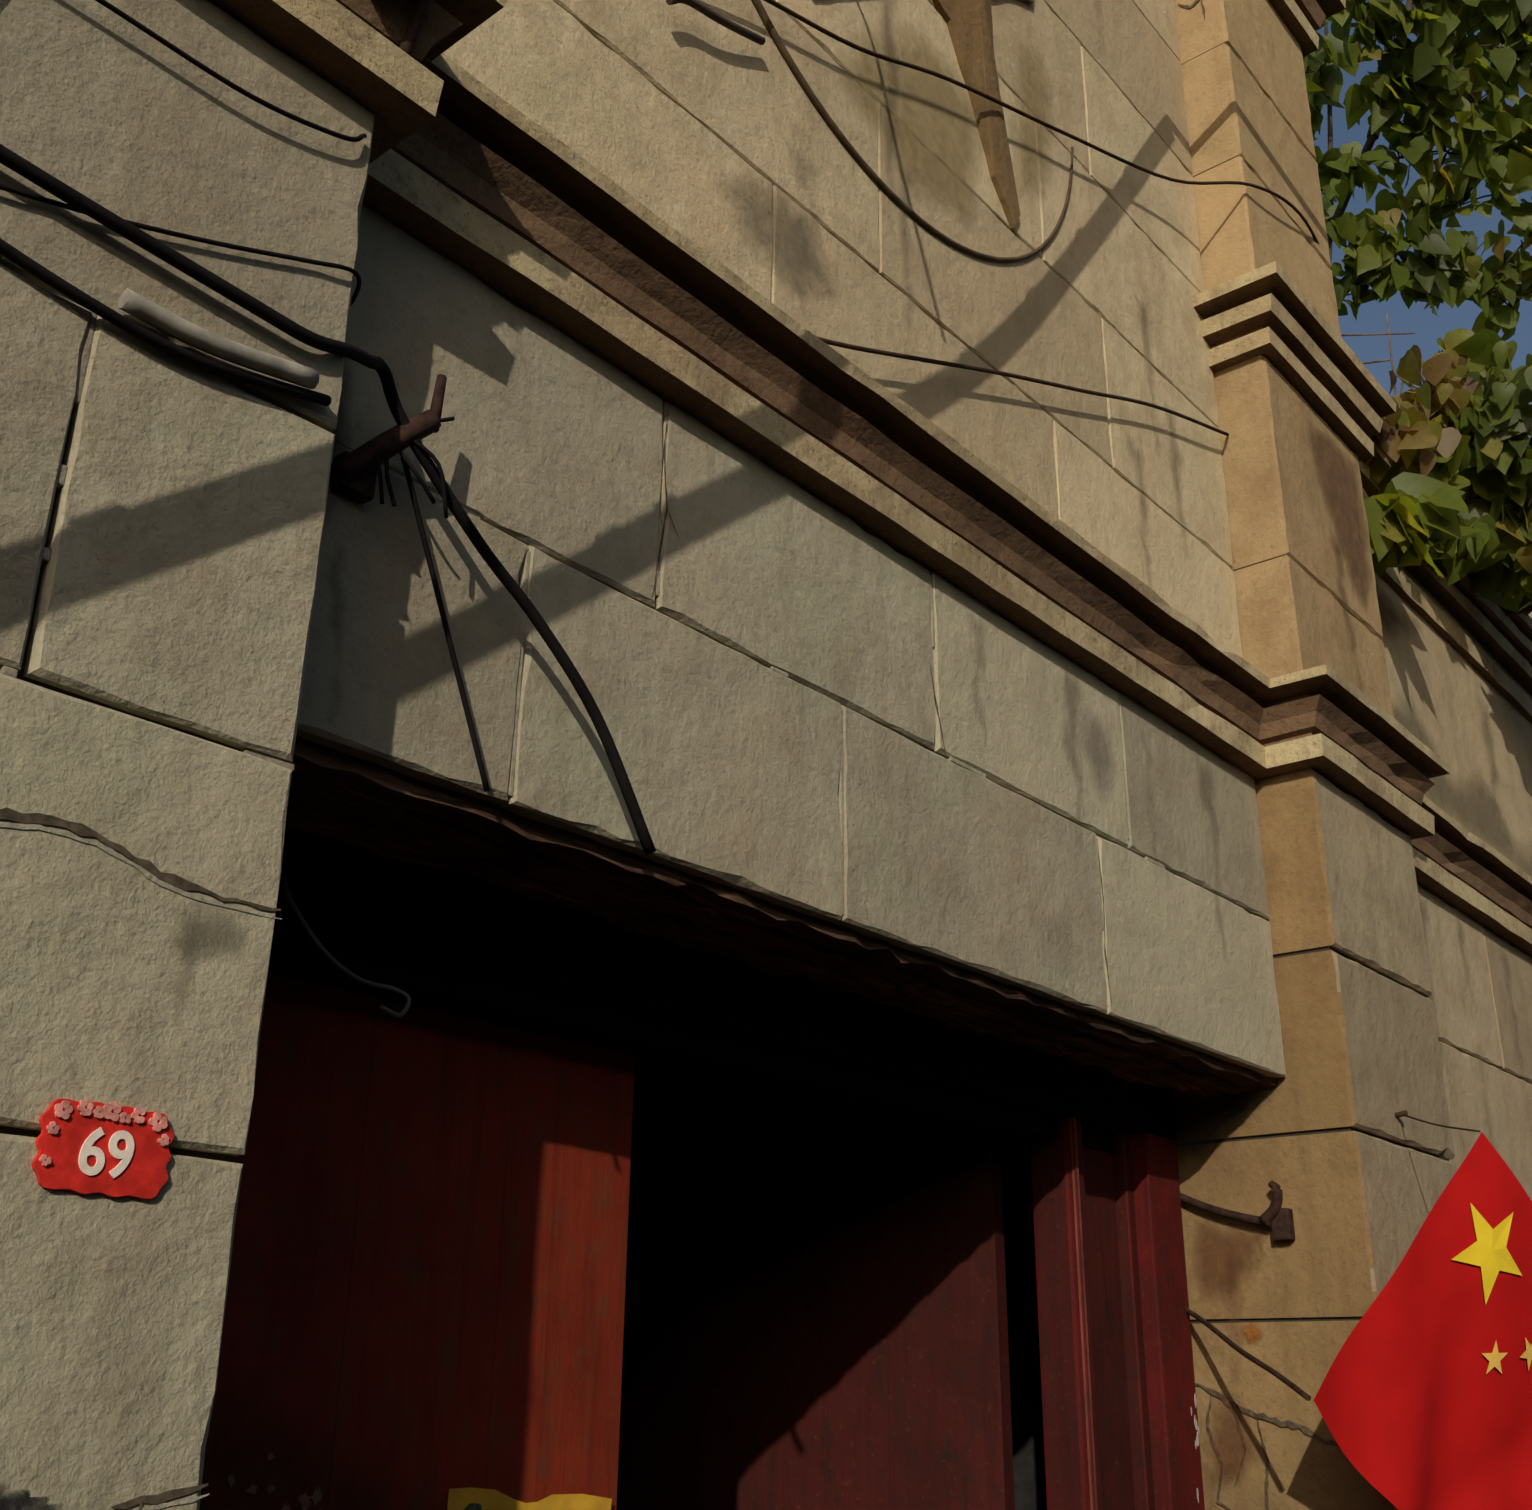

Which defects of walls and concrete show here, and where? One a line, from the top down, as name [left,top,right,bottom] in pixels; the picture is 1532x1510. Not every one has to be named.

crack [0,808,281,919]
crack [1195,1383,1339,1510]